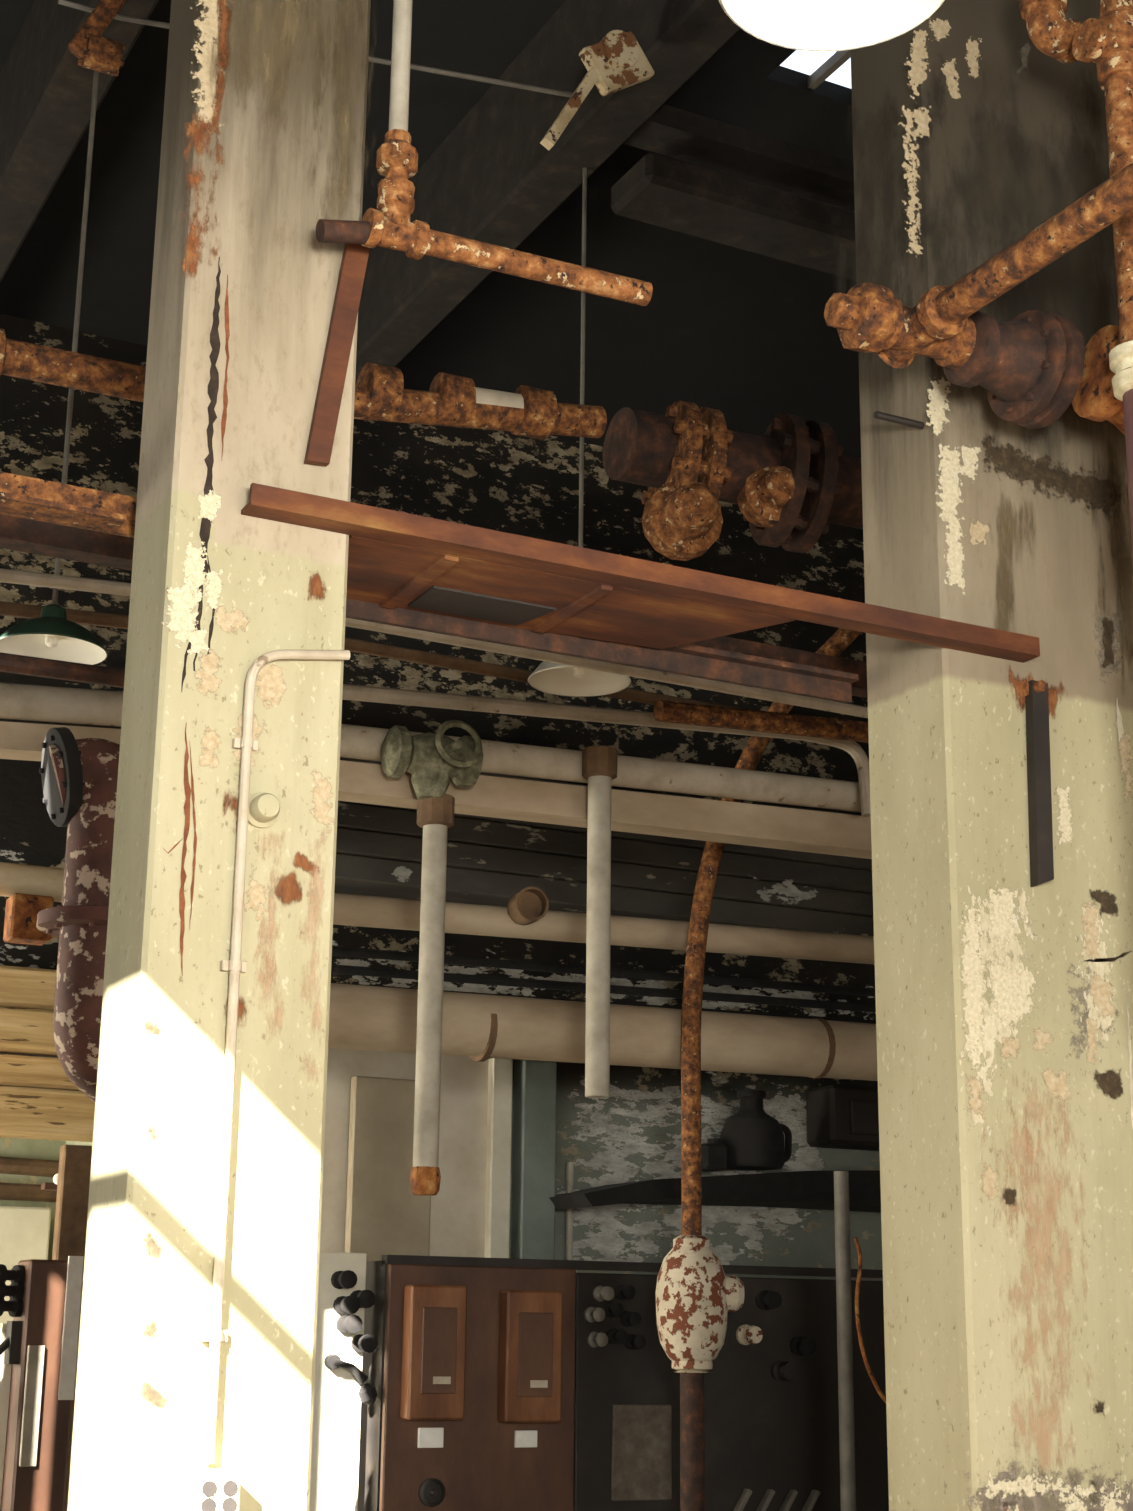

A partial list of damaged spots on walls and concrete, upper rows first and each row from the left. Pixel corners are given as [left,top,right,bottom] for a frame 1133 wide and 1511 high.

spalling [182,0,233,276]
peeling [904,17,982,138]
peeling [197,490,221,526]
peeling [926,376,1118,595]
peeling [161,541,249,700]
peeling [1055,787,1073,845]
rust [269,852,320,939]
peeling [954,885,1123,1136]
peeling [981,1164,1017,1205]
peeling [965,1462,1133,1511]